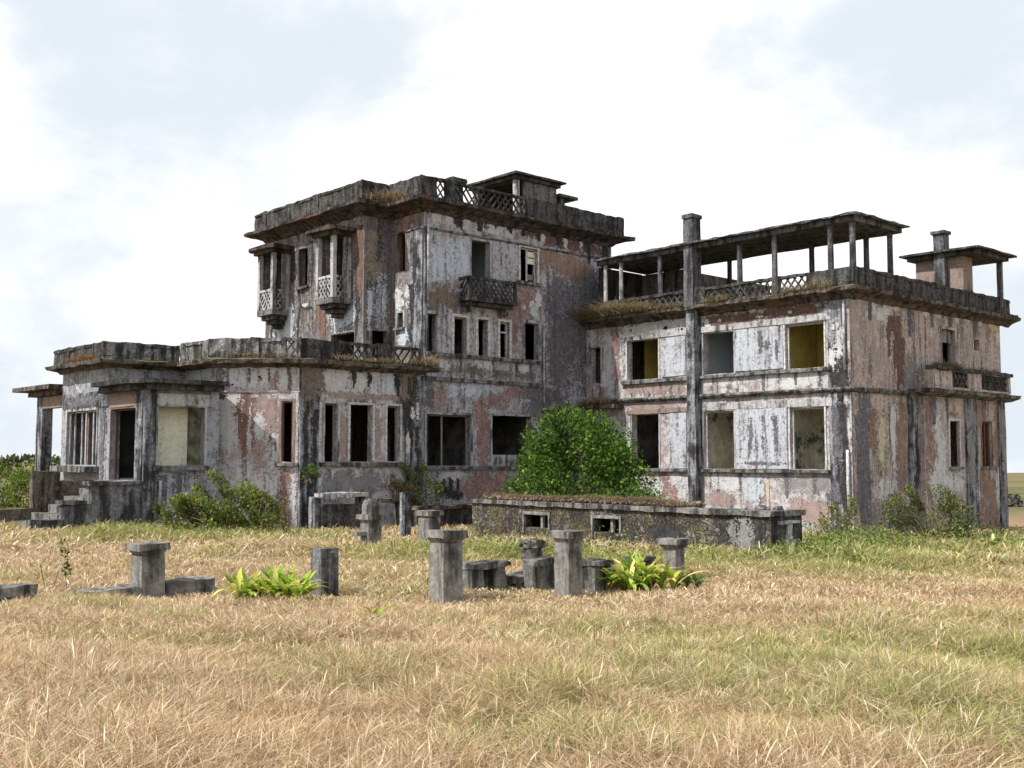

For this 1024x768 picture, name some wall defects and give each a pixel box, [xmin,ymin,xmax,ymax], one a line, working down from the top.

peeling [347,228,387,330]
peeling [394,283,409,311]
peeling [397,328,409,346]
damp [454,217,541,241]
damp [393,242,611,480]
damp [902,308,915,391]
peeling [219,367,292,477]
damp [286,367,396,511]
peeling [702,468,736,508]
peeling [783,496,831,531]
damp [737,355,910,535]
damp [998,409,1009,533]